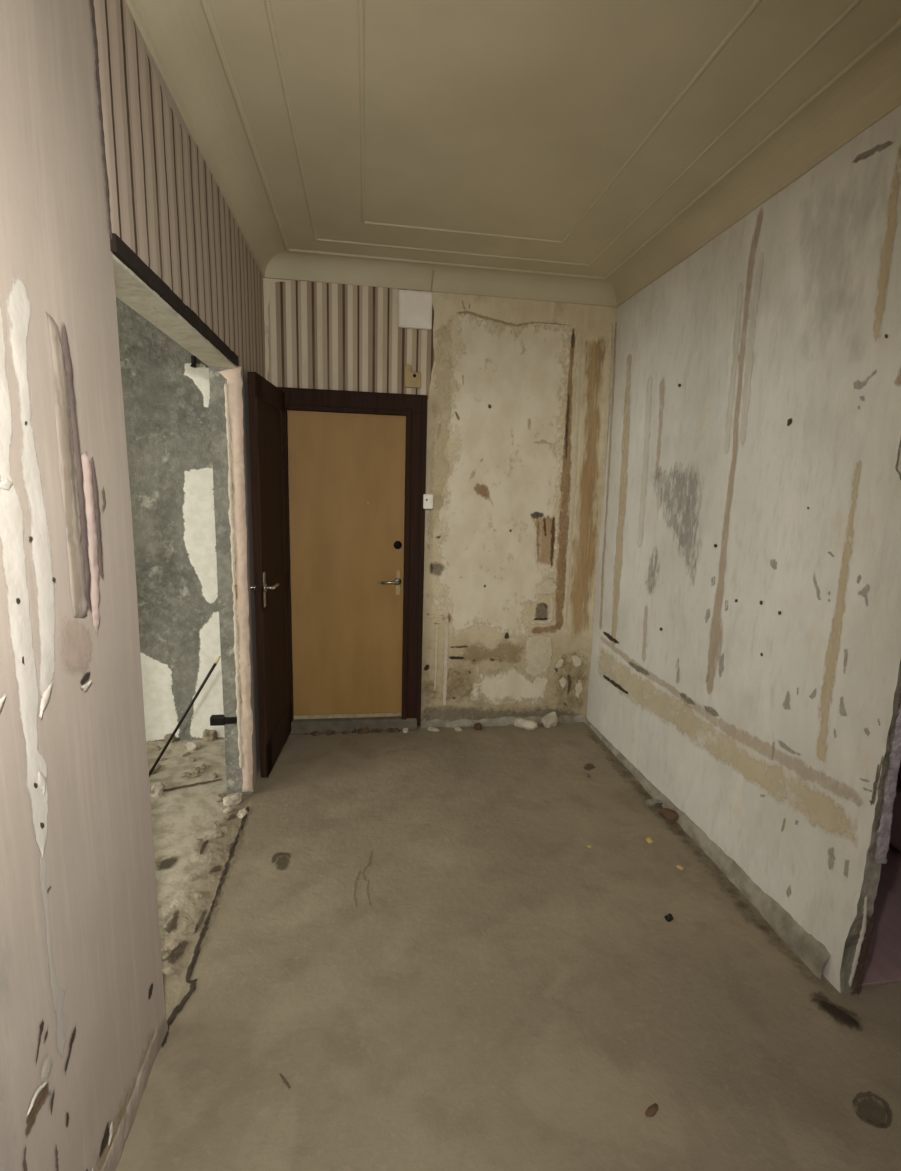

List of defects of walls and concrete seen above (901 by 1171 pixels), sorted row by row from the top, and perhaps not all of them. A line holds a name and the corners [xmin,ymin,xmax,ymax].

flaking render [140,363,253,792]
peeling [525,578,587,707]
spalling [80,672,92,692]
peeling [680,693,718,716]
flaking render [783,688,816,709]
flaking render [23,1082,55,1171]
flaking render [86,1121,113,1171]